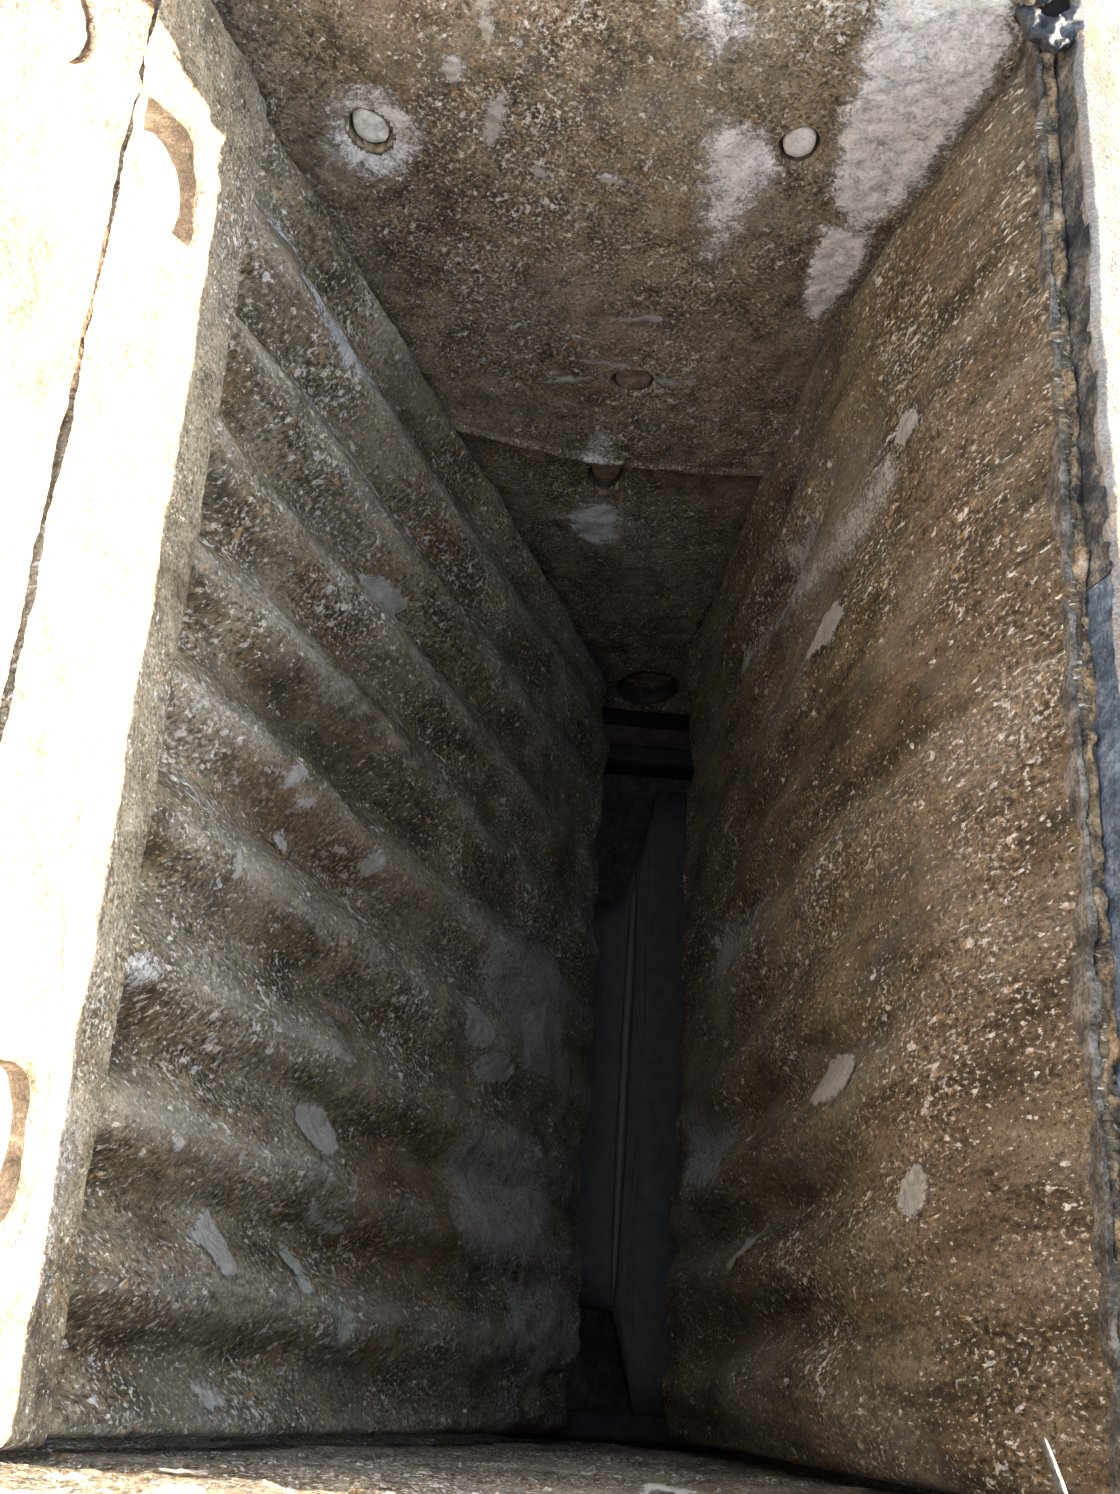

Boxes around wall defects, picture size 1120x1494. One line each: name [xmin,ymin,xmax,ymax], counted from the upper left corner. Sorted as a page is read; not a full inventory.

damp [697,116,783,266]
peeling [800,0,1022,320]